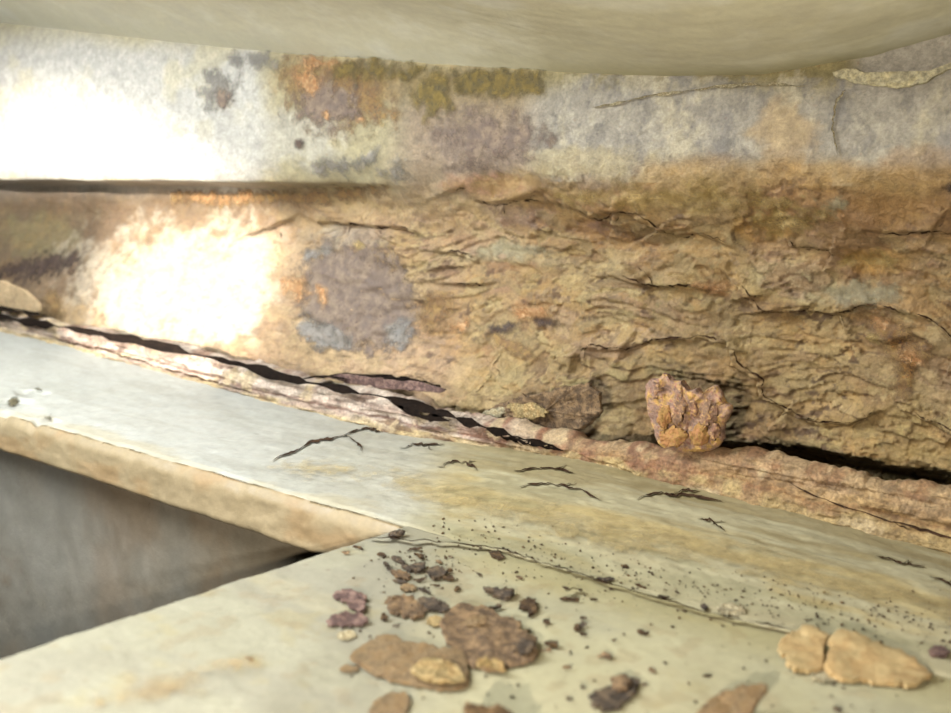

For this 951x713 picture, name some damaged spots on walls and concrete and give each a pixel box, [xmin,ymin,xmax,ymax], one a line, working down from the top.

leakage [401,65,544,120]
crack [579,211,725,243]
crack [888,225,951,236]
peeling [0,280,42,317]
crack [624,268,713,291]
crack [742,286,951,337]
crack [0,305,601,500]
crack [580,335,872,423]
peeling [377,547,461,594]